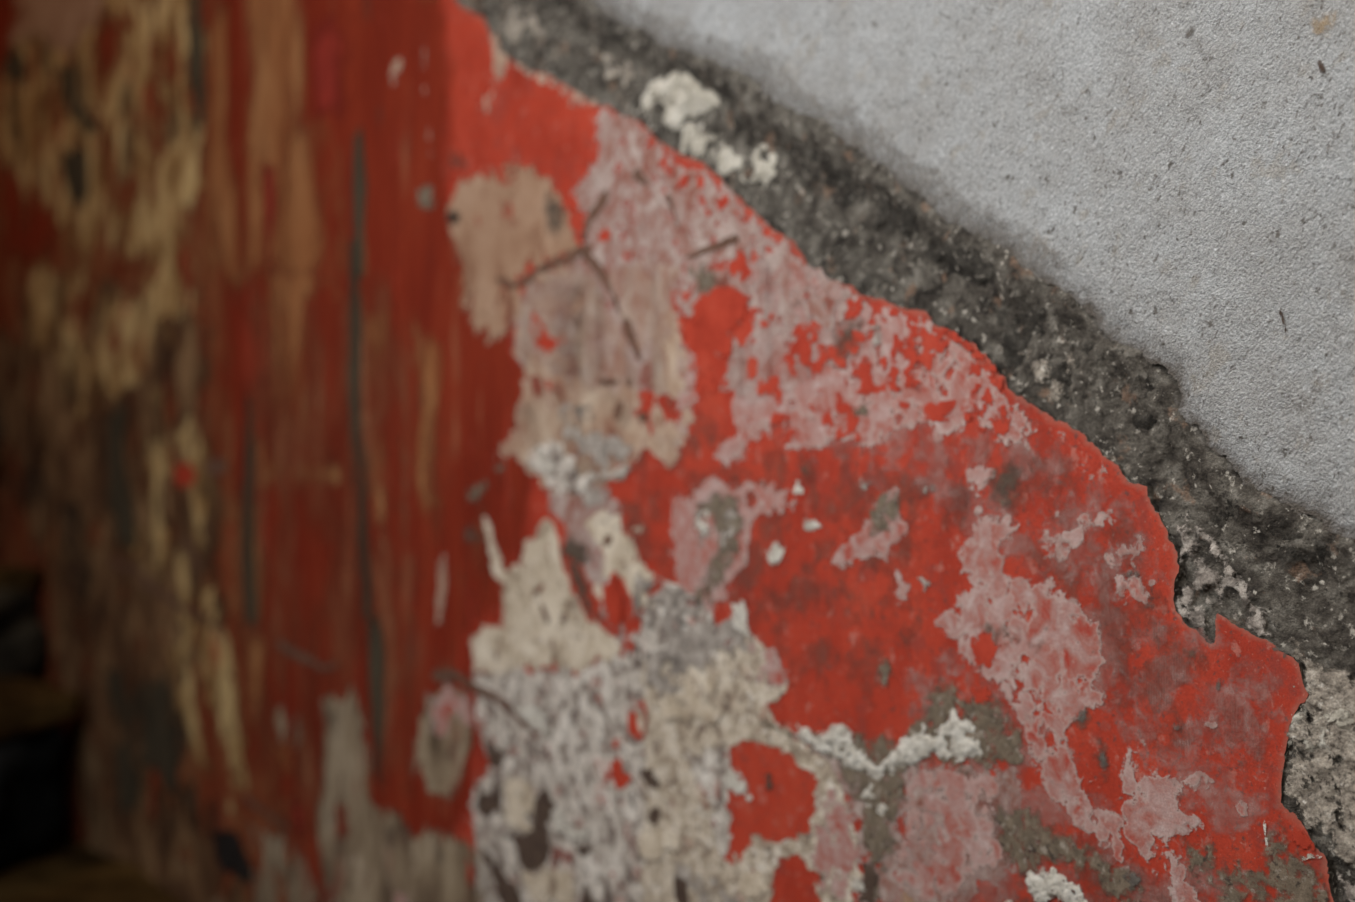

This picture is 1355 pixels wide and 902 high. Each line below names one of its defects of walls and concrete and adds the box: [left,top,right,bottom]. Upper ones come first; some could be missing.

spalling [317,0,1355,902]
leakage [1025,867,1088,902]